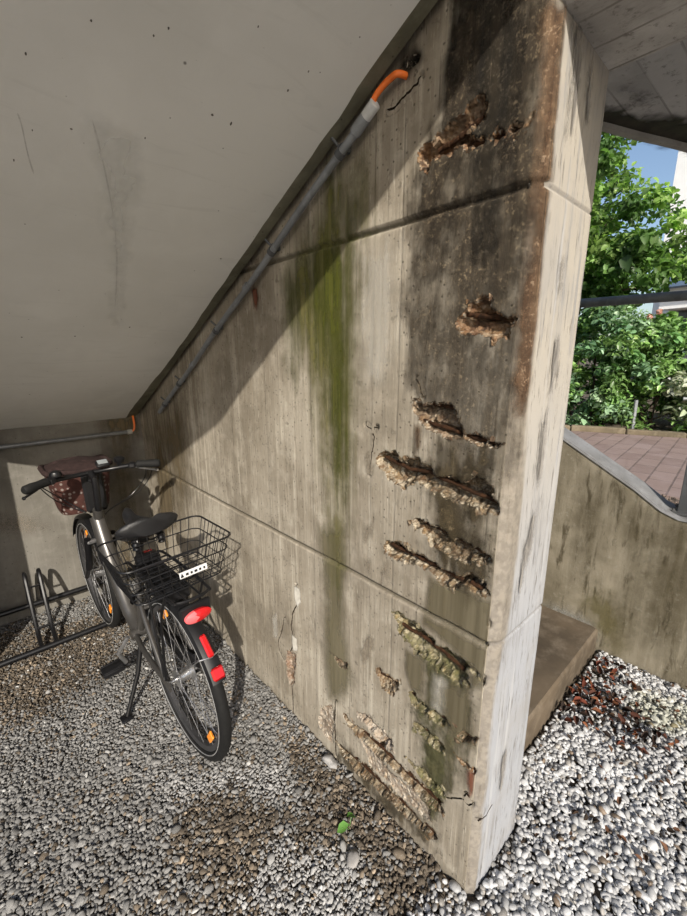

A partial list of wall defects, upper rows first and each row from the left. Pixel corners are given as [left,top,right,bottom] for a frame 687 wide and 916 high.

crack [387,74,424,116]
leakage [399,48,421,74]
leakage [560,23,593,133]
leakage [406,0,554,481]
spalling [411,396,506,449]
spalling [367,450,500,516]
spalling [384,518,492,599]
leakage [436,492,480,547]
leakage [519,514,535,594]
crack [277,584,301,717]
spalling [391,611,481,689]
spalling [318,705,446,841]